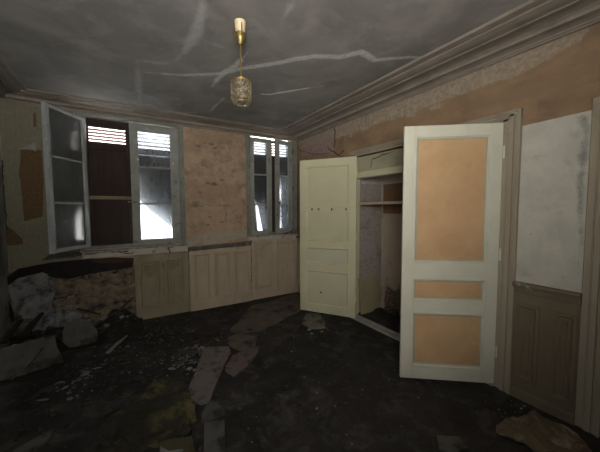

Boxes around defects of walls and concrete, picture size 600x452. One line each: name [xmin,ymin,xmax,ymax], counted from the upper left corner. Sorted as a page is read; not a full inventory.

crack [133,49,420,100]
peeling [18,149,44,221]
flaking render [7,257,137,337]